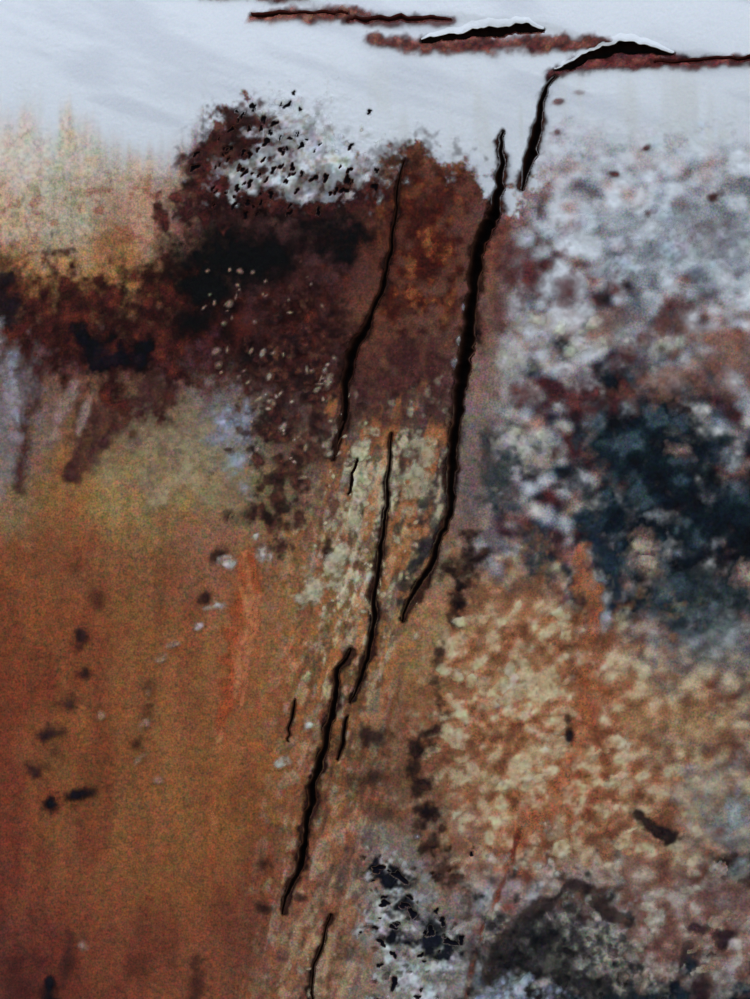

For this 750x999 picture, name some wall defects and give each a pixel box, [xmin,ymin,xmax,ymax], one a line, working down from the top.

spalling [152,90,400,239]
rust [497,243,560,304]
rust [0,248,353,558]
crack [280,75,558,915]
water stain [481,426,551,512]
rust [510,375,635,413]
water stain [553,365,750,634]
spalling [353,530,712,999]
rust [490,543,604,912]
crack [304,913,334,999]
spalling [616,879,750,984]
water stain [656,923,737,999]